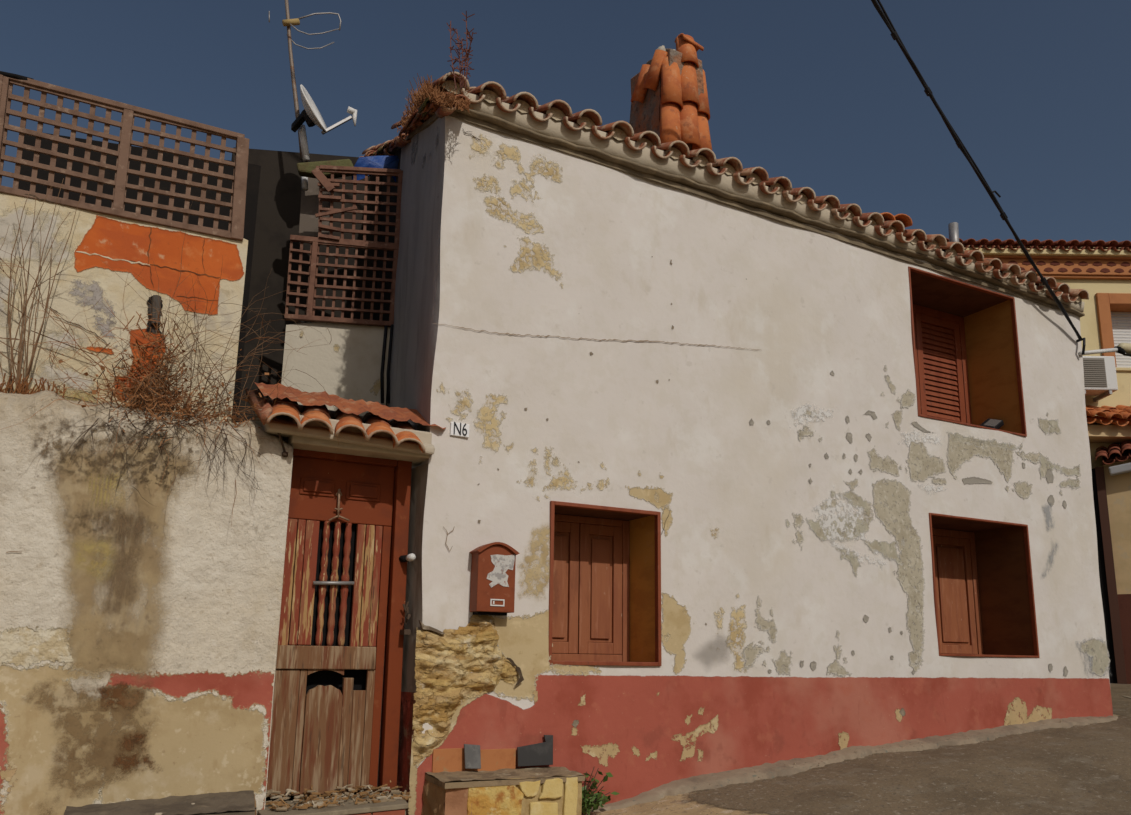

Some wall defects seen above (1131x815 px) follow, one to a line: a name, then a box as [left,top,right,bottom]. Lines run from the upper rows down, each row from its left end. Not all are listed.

peeling [469,134,563,288]
flaking render [0,206,244,400]
crack [439,324,761,350]
damp [35,422,193,675]
peeling [625,470,673,536]
peeling [786,365,1081,675]
damp [29,684,148,791]
peeling [0,624,267,815]
flaking render [408,609,601,815]
peeling [661,593,691,674]
peeling [705,594,855,677]
peeling [1080,638,1110,677]